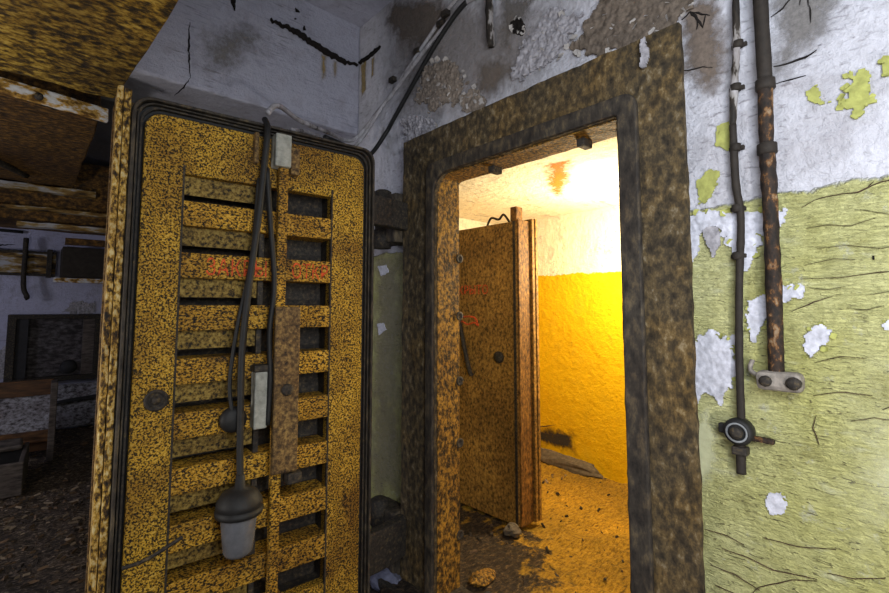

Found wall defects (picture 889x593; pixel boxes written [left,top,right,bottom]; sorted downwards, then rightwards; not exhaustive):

spalling [509,0,694,82]
crack [771,0,811,22]
peeling [806,55,889,120]
peeling [690,169,764,271]
crack [791,180,889,312]
peeling [695,329,736,406]
peeling [744,289,767,343]
peeling [783,283,805,303]
peeling [802,321,838,359]
crack [813,392,889,421]
peeling [765,492,789,516]
crack [705,529,884,593]